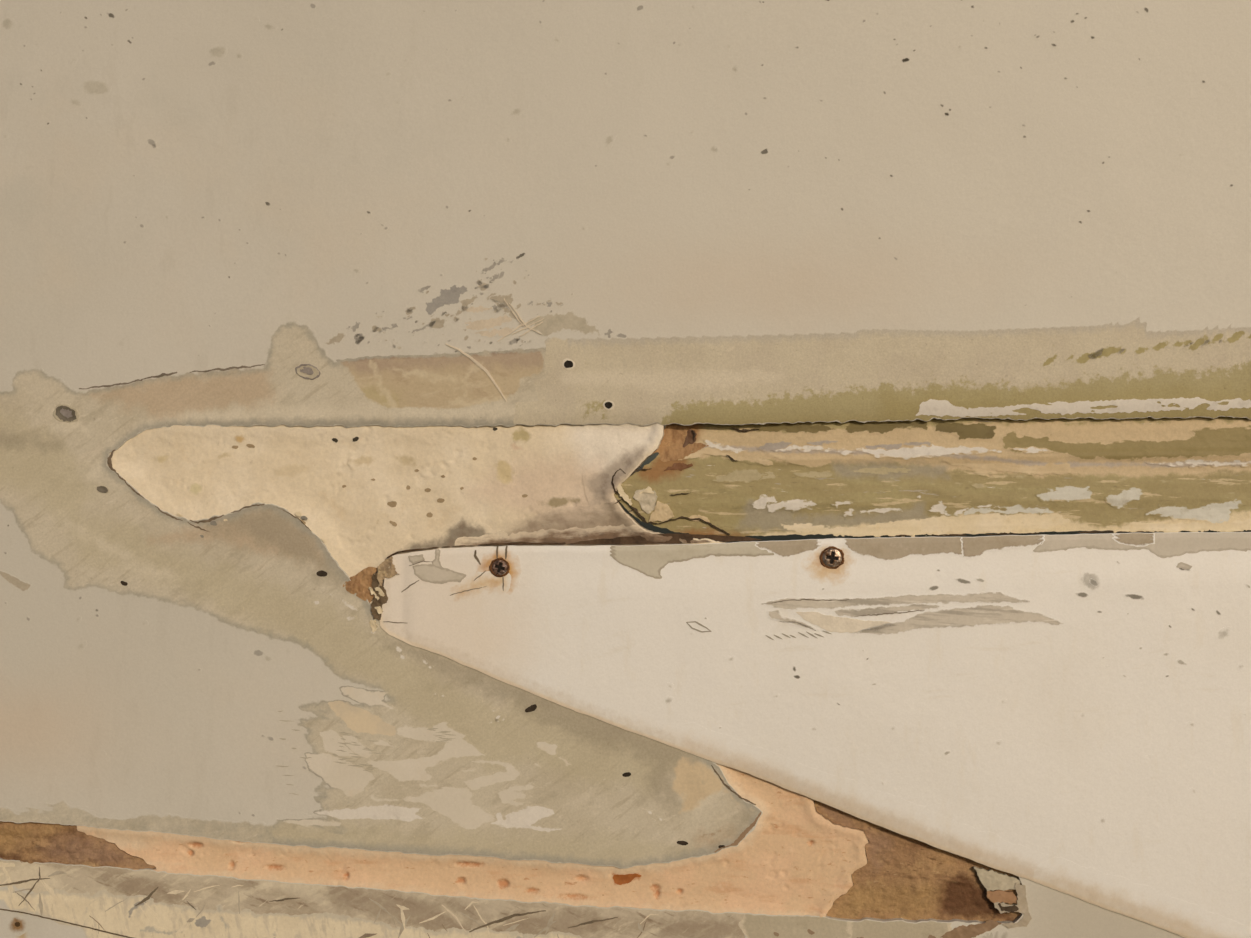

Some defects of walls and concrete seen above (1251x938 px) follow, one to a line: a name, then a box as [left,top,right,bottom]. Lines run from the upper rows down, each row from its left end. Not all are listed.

corrosion [449,547,522,603]
peeling [0,252,1251,938]
corrosion [800,542,857,587]